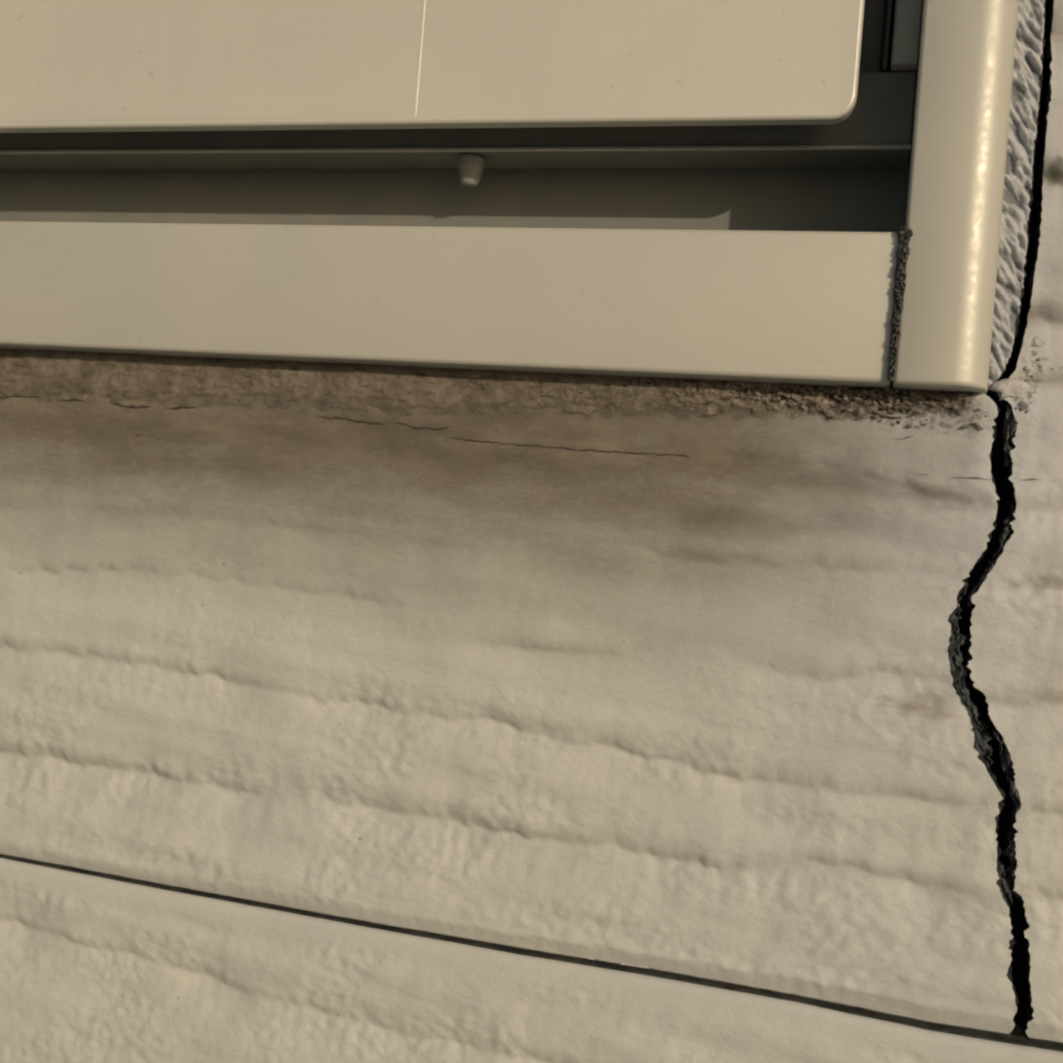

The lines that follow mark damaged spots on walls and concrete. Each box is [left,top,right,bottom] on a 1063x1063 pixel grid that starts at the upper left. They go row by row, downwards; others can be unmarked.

crack [0,394,84,402]
crack [112,401,197,409]
crack [697,396,846,417]
leakage [0,384,824,526]
crack [319,416,693,457]
crack [871,0,1054,1041]